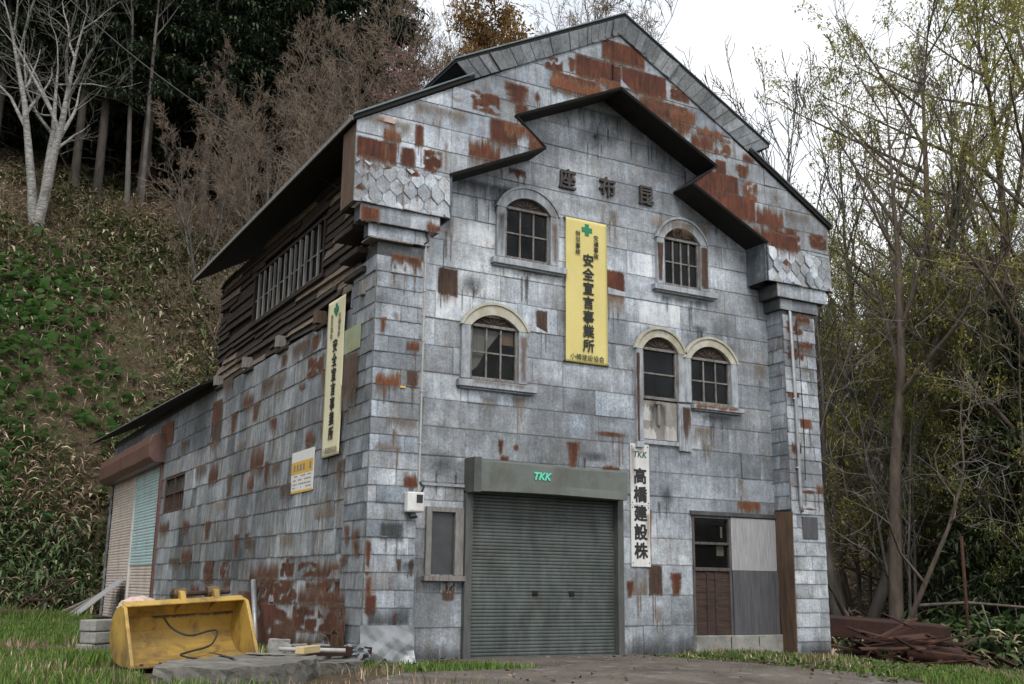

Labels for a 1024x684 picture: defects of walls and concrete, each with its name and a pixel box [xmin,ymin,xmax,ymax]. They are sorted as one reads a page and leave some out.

rust [357,124,424,199]
rust [468,80,543,183]
rust [550,40,798,274]
rust [438,267,458,308]
rust [607,270,625,299]
rust [536,310,547,349]
rust [376,338,419,403]
rust [195,377,272,496]
rust [682,404,738,440]
rust [297,525,376,620]
rust [649,565,682,619]
rust [273,621,344,657]